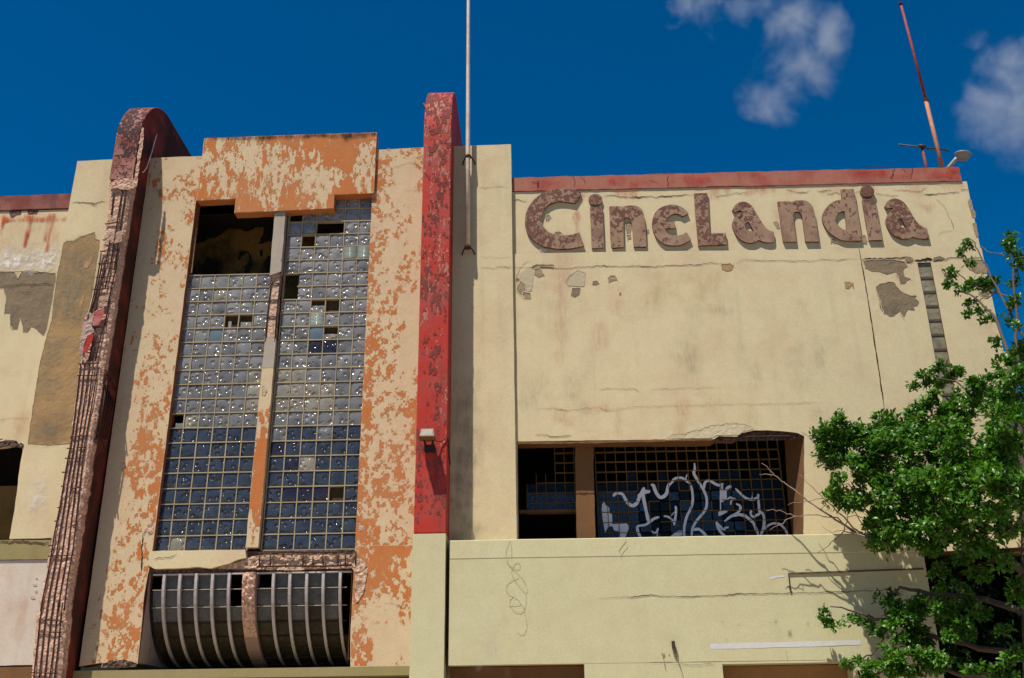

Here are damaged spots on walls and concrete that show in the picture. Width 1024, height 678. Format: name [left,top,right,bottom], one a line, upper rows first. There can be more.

rust [1,214,65,247]
damp [0,247,87,317]
spalling [516,247,554,299]
spalling [857,234,919,318]
crack [457,250,980,404]
spalling [0,93,453,678]
spalling [517,431,803,444]
crack [535,387,828,438]
crack [600,589,904,599]